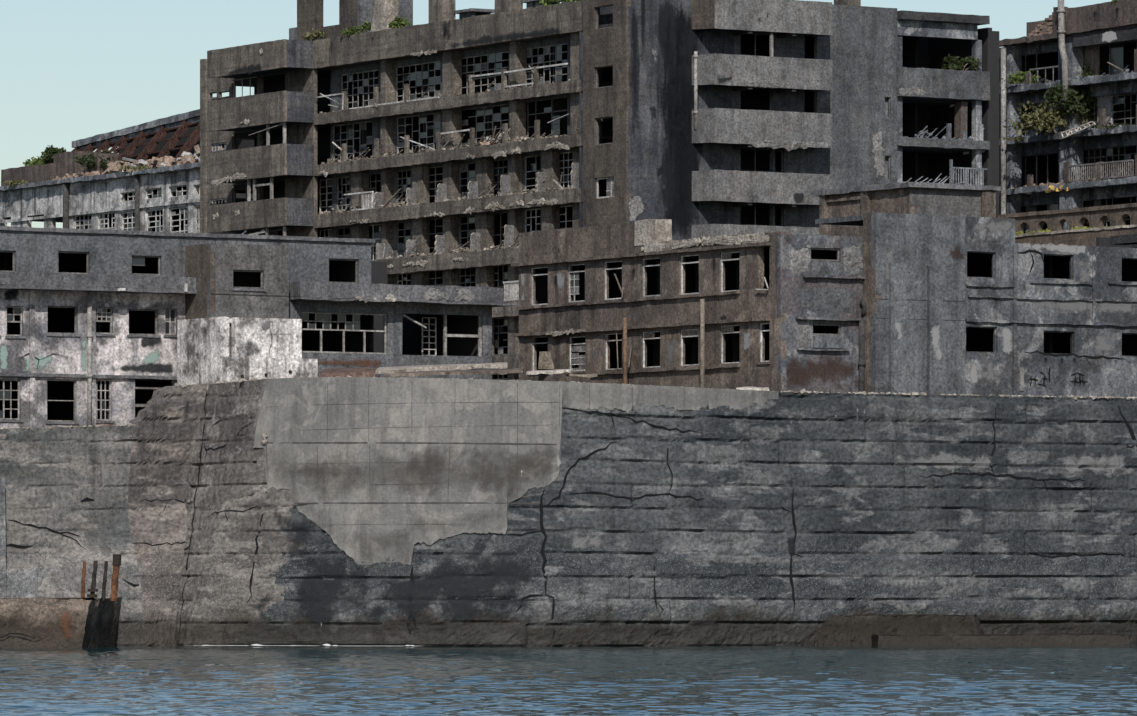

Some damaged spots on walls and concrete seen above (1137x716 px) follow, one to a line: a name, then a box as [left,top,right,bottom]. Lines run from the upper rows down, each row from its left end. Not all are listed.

damp [5,290,18,300]
damp [141,337,161,347]
damp [121,363,172,373]
crack [1118,405,1137,451]
crack [6,520,87,550]
crack [507,407,704,637]
crack [781,488,803,609]